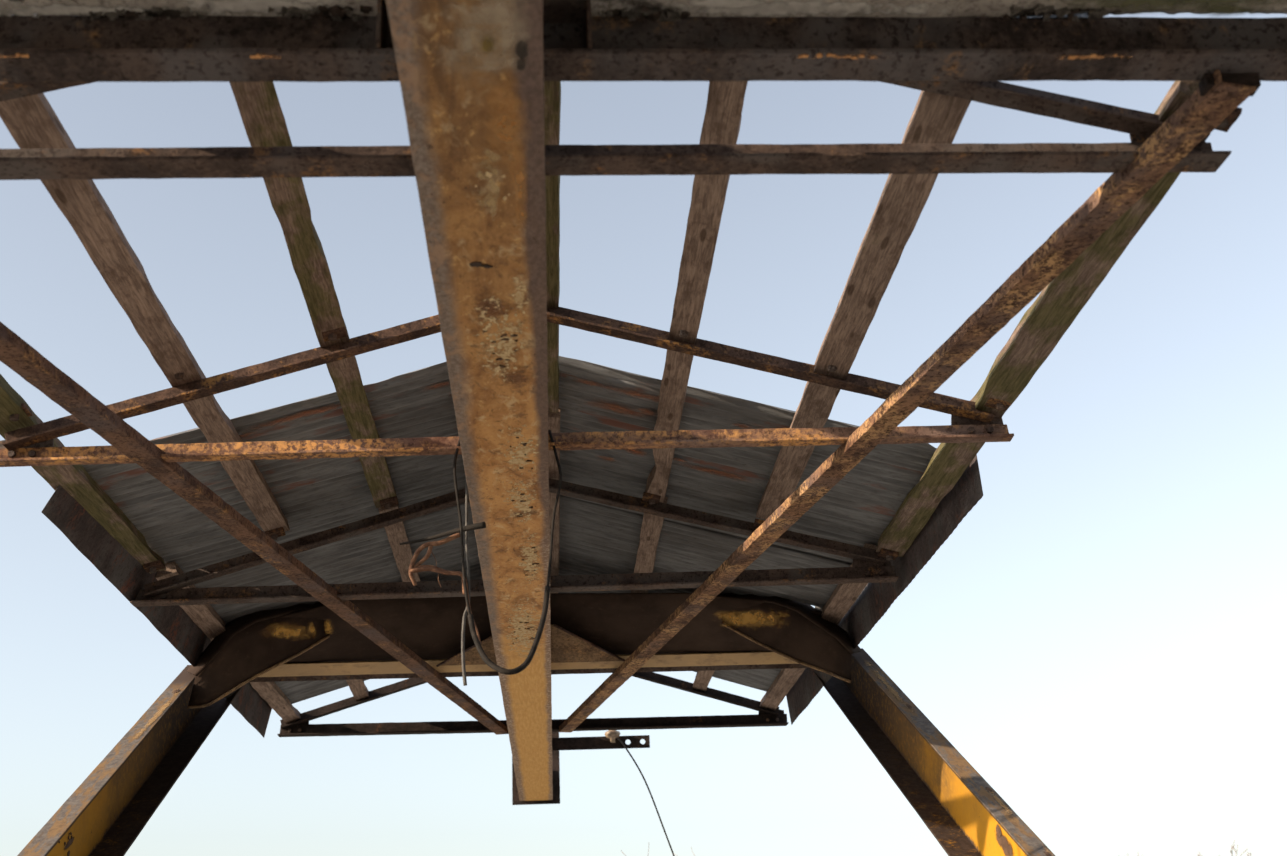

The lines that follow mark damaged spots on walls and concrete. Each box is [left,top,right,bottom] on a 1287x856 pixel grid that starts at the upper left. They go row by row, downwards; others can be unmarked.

corrosion [477,300,505,319]